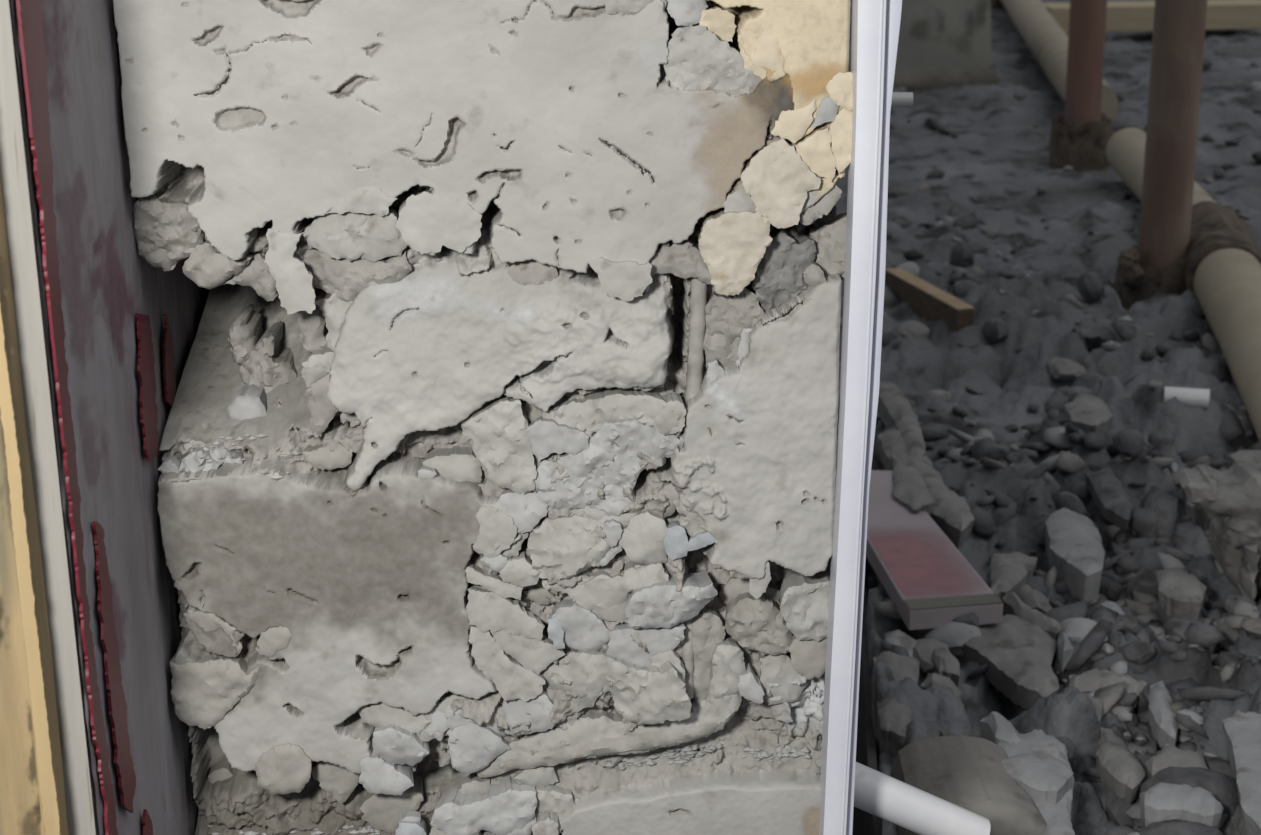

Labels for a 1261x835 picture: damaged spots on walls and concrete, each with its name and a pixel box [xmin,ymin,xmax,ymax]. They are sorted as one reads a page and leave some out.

crack [193,40,266,96]
spalling [212,105,267,132]
spalling [392,115,469,168]
crack [501,0,554,23]
crack [558,139,654,183]
spalling [551,0,785,111]
spalling [588,71,853,399]
damp [700,87,775,194]
damp [706,0,851,151]
damp [810,168,845,196]
spalling [133,160,589,558]
spalling [169,560,830,835]